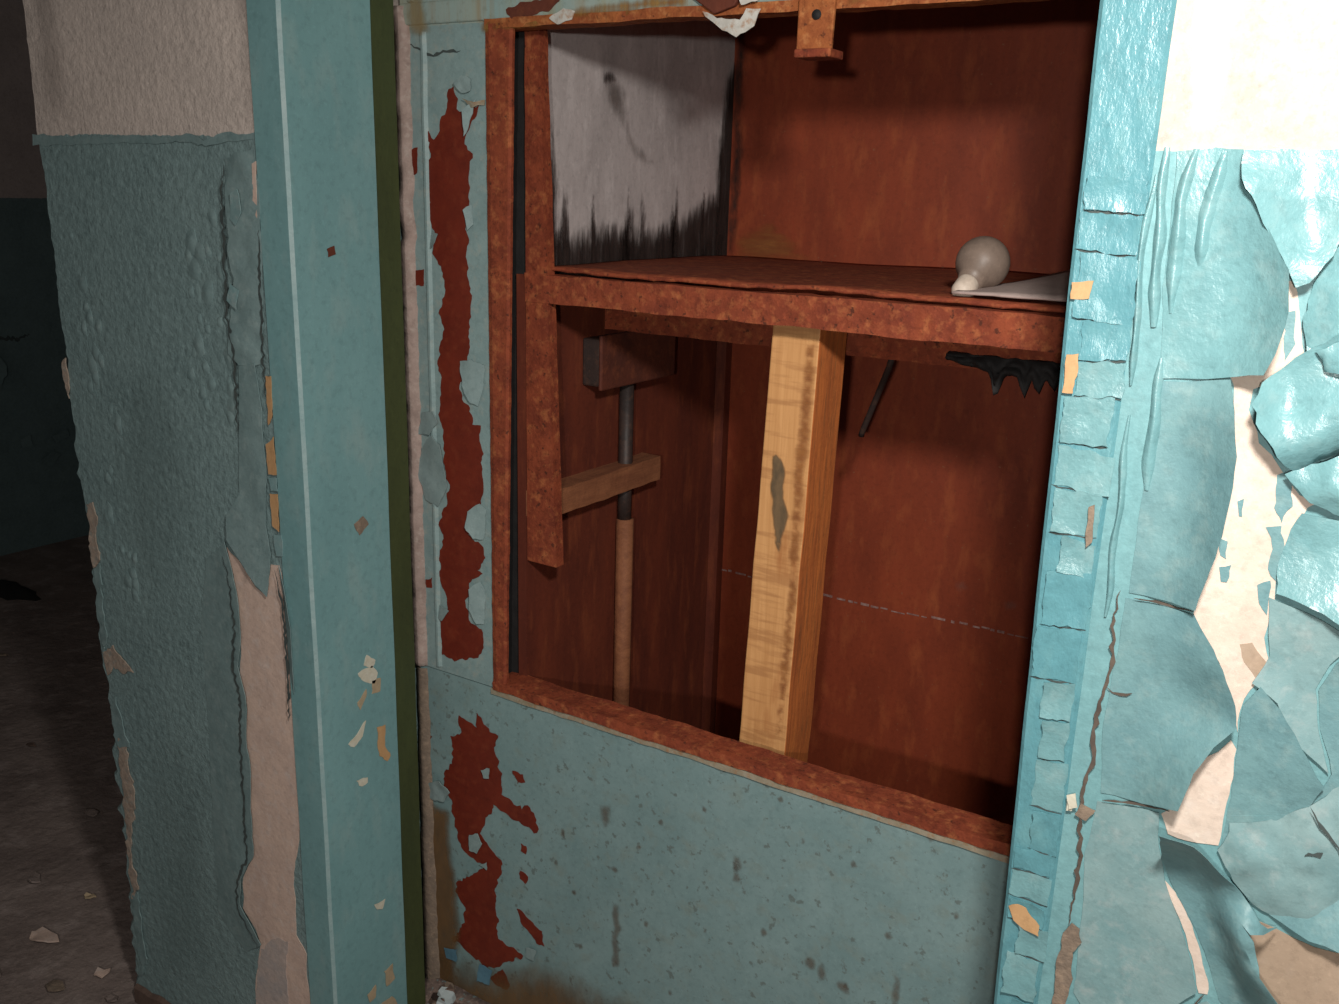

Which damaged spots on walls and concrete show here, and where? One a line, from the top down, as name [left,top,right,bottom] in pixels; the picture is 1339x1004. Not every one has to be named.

peeling [32,132,310,1004]
rust [433,809,585,1004]
peeling [1052,147,1339,1004]